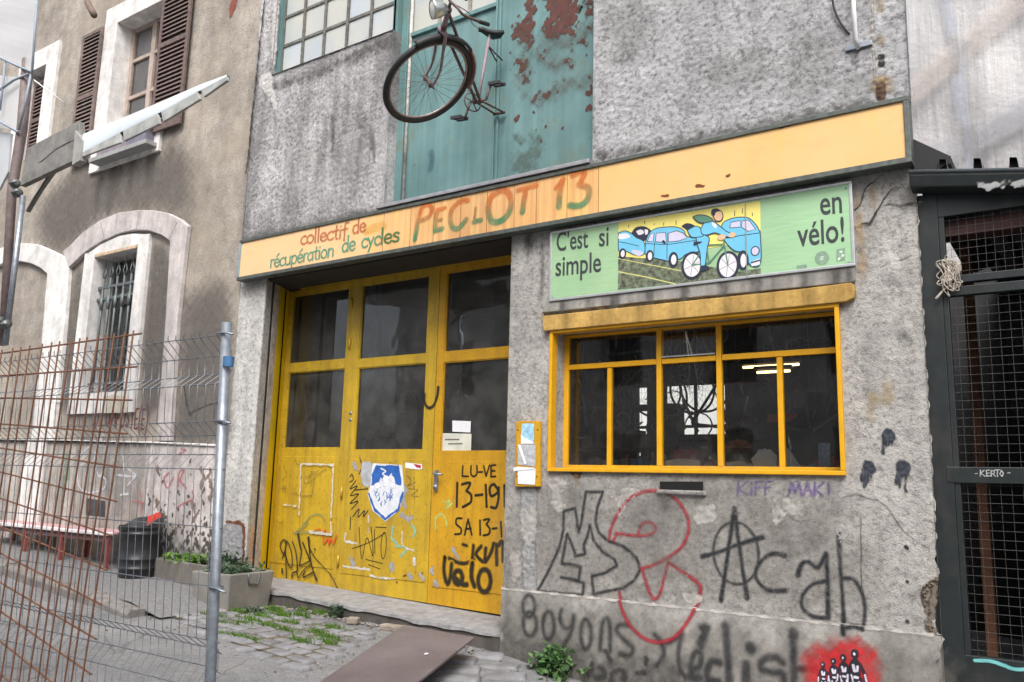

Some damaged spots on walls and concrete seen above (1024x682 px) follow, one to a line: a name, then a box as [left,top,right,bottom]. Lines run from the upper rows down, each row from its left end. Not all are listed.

corrosion [509,0,594,122]
corrosion [871,0,890,101]
crack [854,178,922,228]
spalling [920,574,939,634]